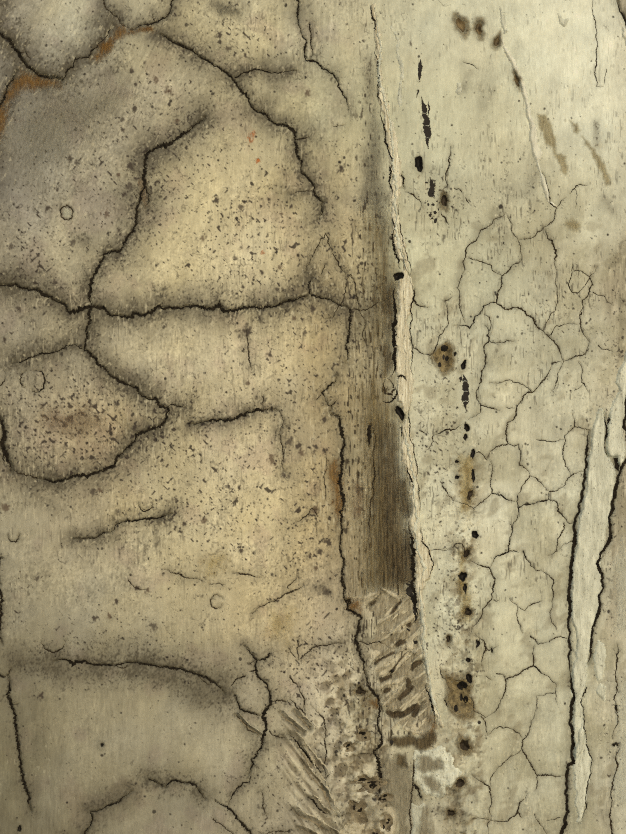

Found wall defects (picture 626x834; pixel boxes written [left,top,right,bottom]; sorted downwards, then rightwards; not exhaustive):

crack [0,589,8,640]
crack [0,669,31,810]
crack [0,0,392,483]
crack [59,377,388,834]
peeling [281,3,462,834]
leakage [365,344,413,587]
crack [441,146,469,203]
crack [409,182,626,834]
peeling [570,351,626,824]